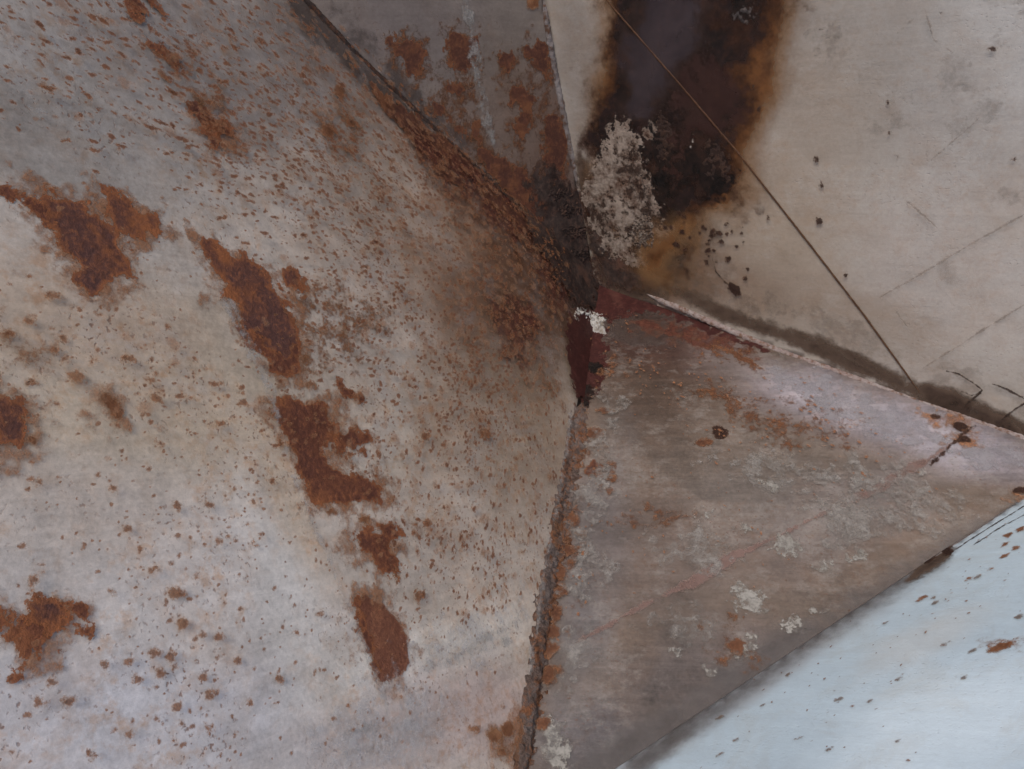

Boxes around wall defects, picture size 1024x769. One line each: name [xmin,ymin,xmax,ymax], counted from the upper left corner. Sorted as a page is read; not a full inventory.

corrosion [0,0,697,769]
damp [654,286,1024,435]